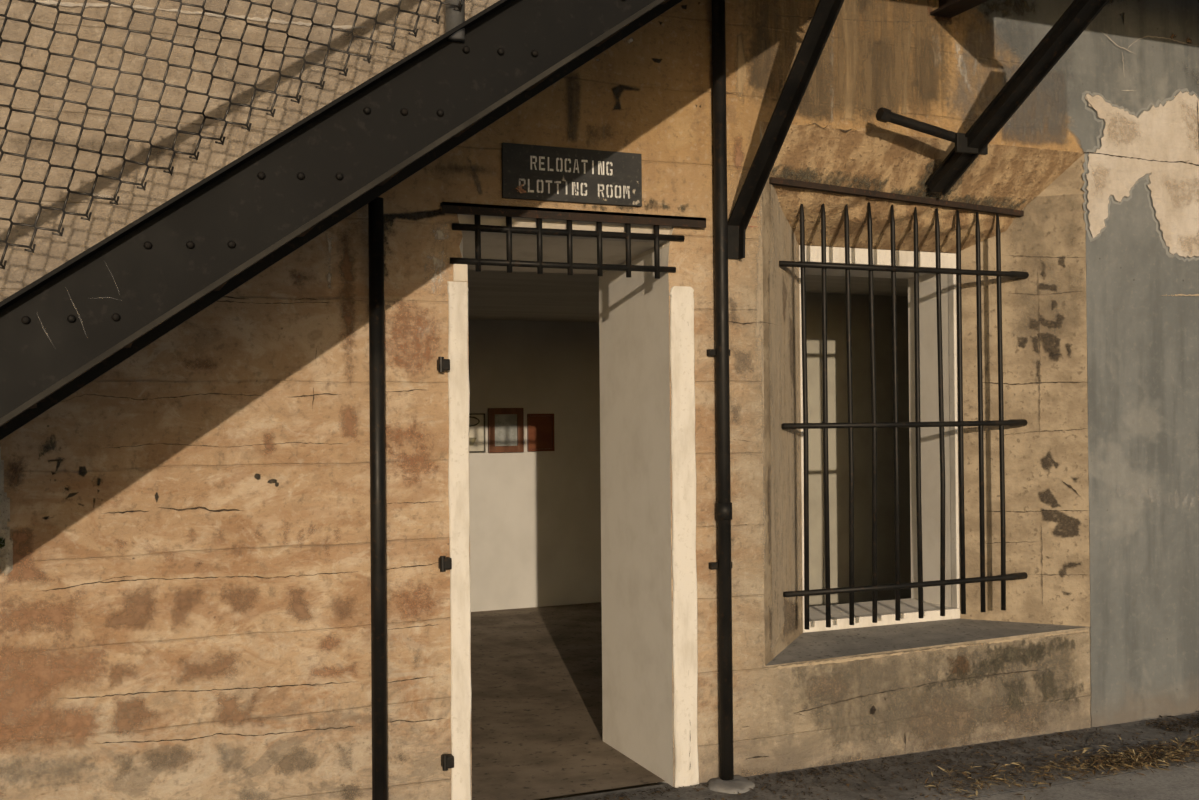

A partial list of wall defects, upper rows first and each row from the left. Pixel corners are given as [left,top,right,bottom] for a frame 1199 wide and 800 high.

peeling [1082,88,1199,262]